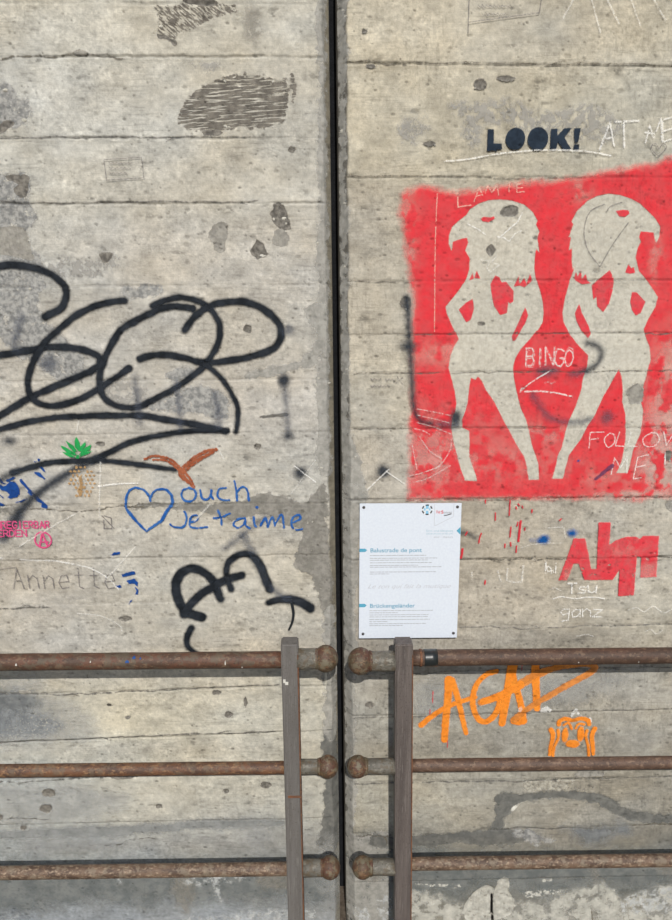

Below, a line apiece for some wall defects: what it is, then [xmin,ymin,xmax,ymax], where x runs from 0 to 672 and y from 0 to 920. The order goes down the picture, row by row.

leakage [0,688,60,736]
leakage [412,847,441,857]
leakage [353,876,393,920]
leakage [412,867,672,920]